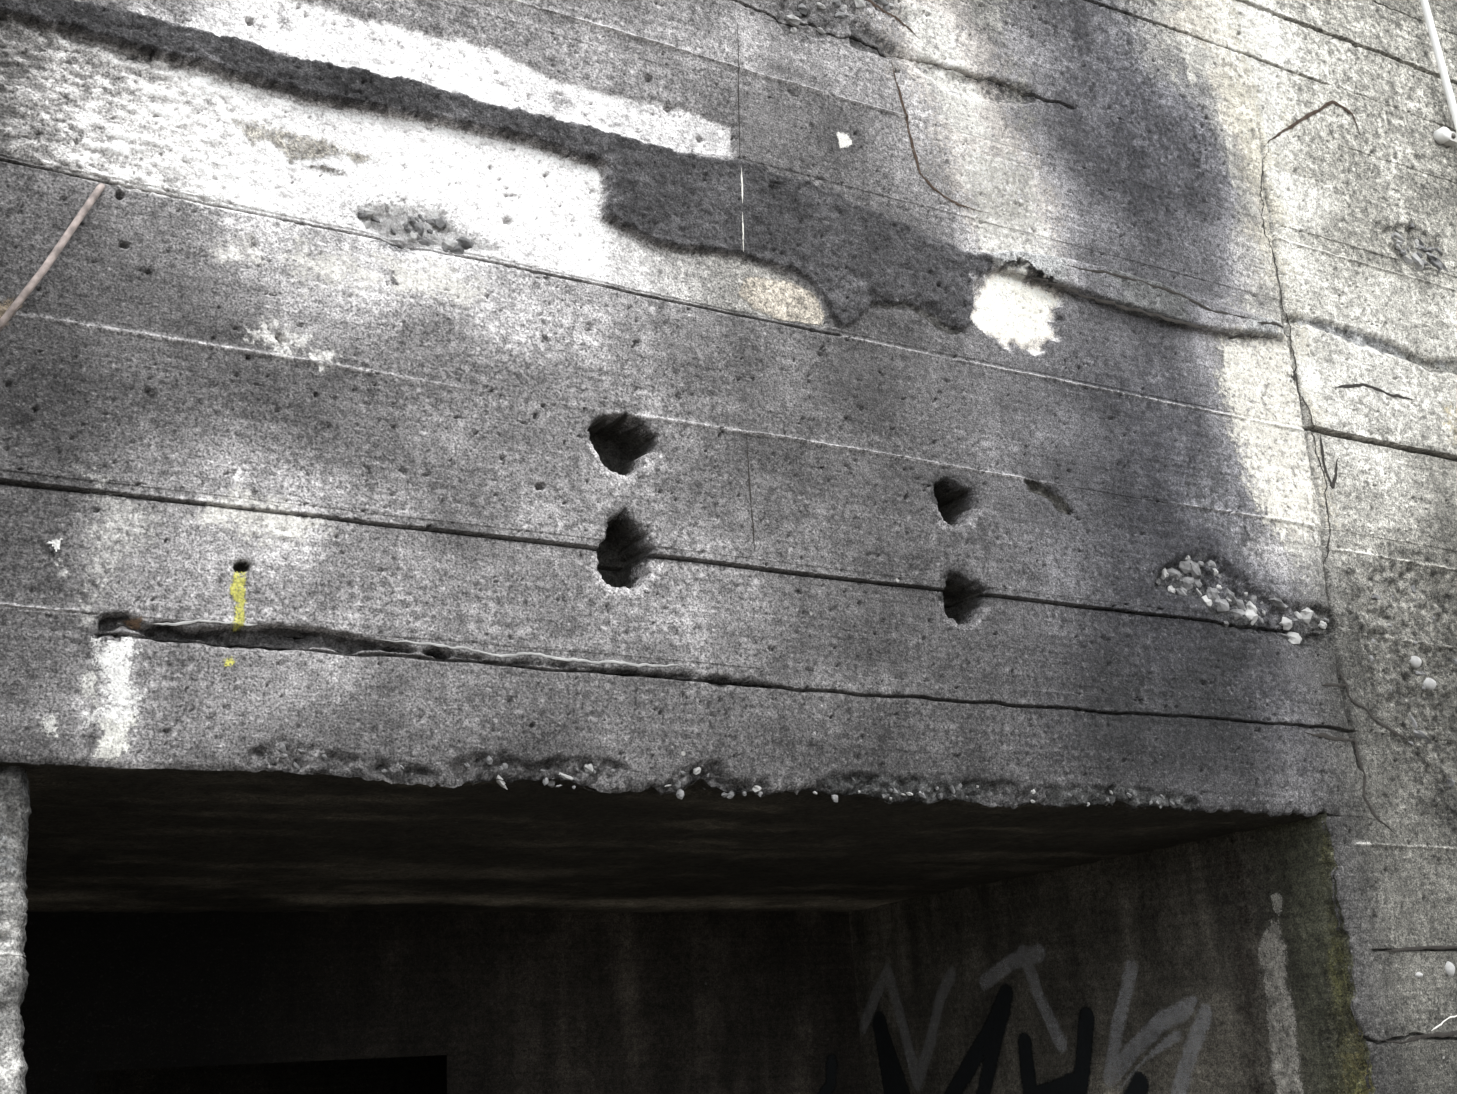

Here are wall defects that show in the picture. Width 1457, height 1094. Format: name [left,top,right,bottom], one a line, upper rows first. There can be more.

spalling [0,0,1059,353]
crack [736,22,744,252]
crack [867,0,990,213]
crack [1257,100,1413,616]
spalling [245,736,629,791]
spalling [659,762,770,800]
spalling [799,772,1198,811]
crack [1305,662,1407,834]